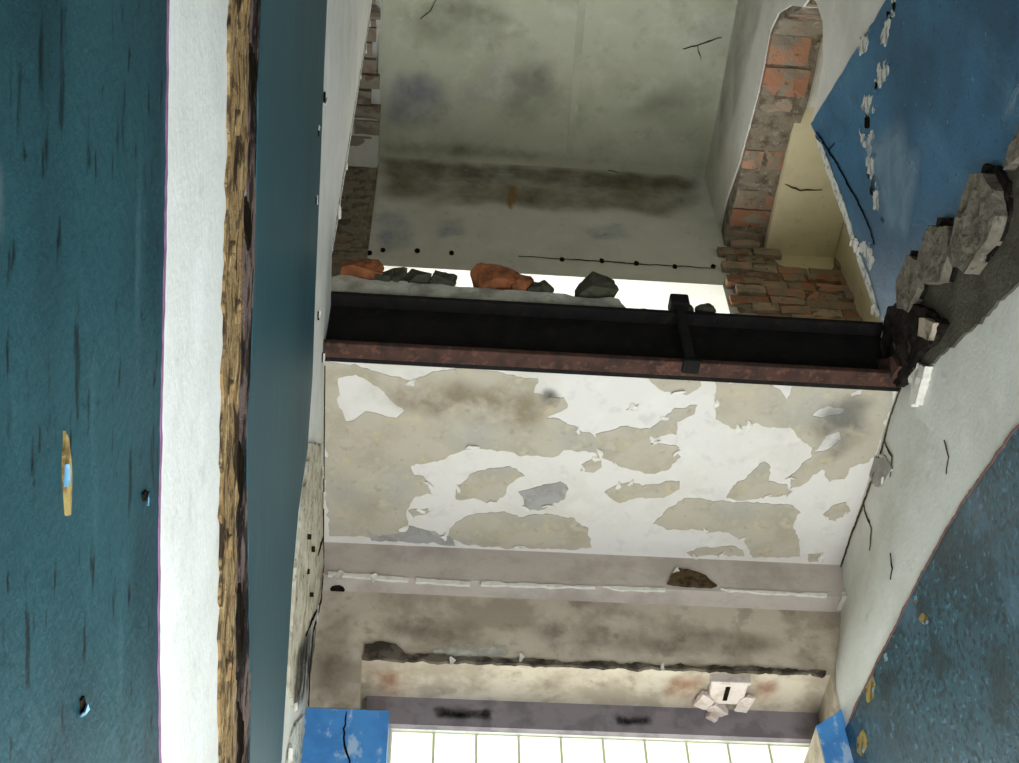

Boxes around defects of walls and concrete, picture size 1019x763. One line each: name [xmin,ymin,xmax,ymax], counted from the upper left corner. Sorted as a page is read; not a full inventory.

damp [460,170,685,210]
flaking render [741,6,822,170]
peeling [859,59,890,223]
peeling [858,0,896,56]
peeling [285,135,950,763]
crack [840,388,902,580]